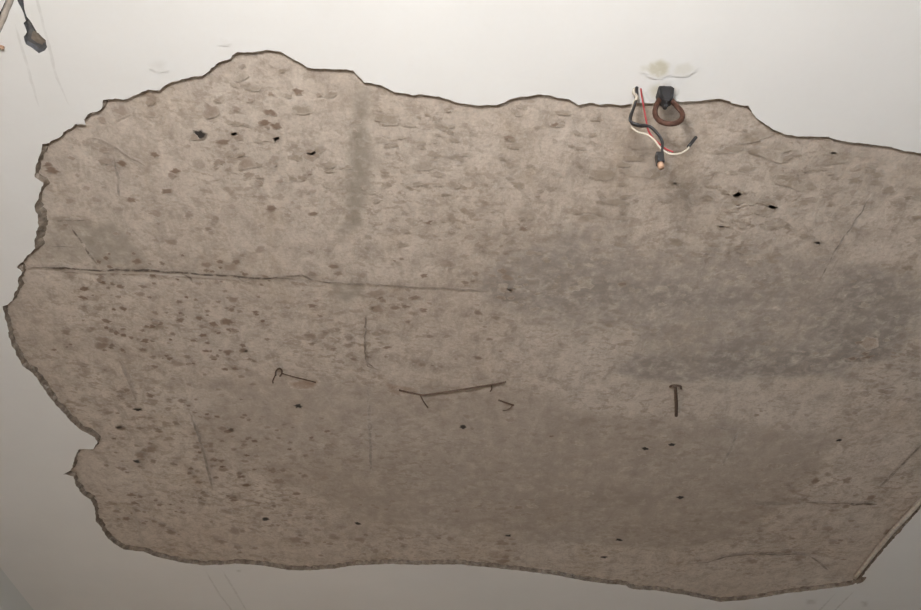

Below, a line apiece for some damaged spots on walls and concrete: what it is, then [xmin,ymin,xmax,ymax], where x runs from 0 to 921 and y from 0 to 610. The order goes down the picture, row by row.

flaking render [658,105,680,121]
crack [25,219,484,291]